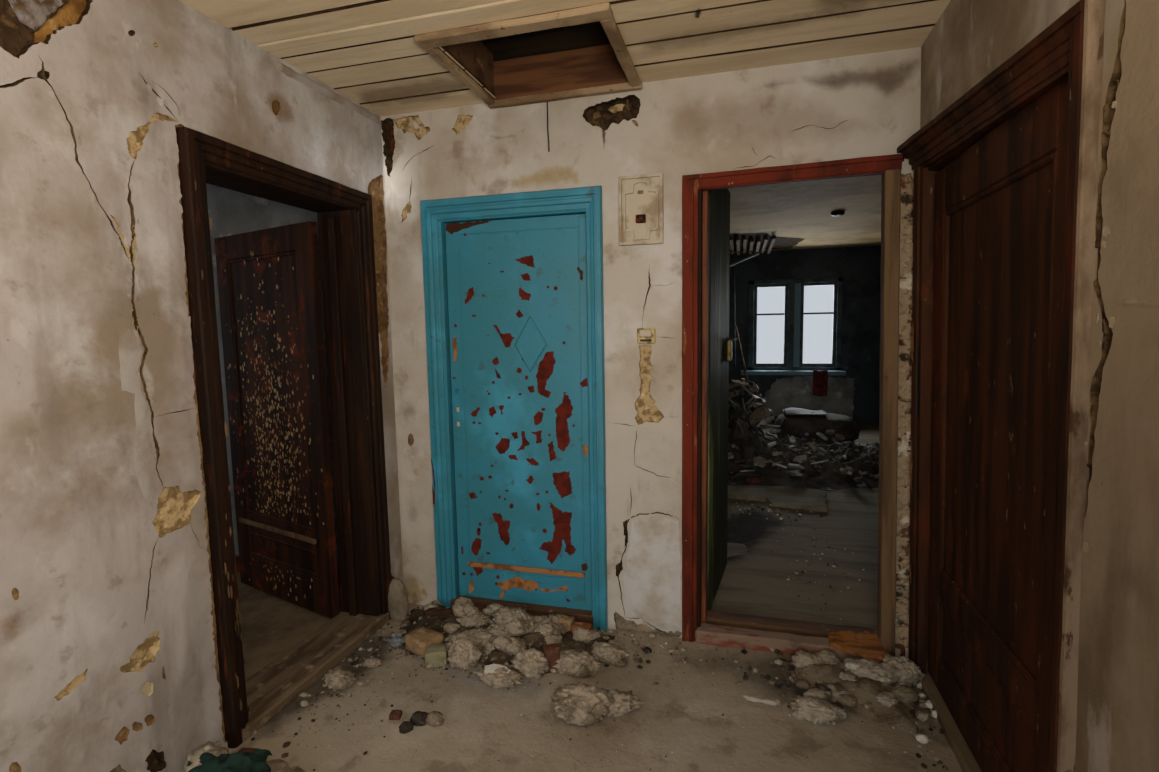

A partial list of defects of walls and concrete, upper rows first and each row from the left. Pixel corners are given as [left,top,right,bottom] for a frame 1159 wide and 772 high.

flaking render [0,0,93,59]
flaking render [126,113,184,160]
flaking render [583,95,641,131]
crack [0,55,193,487]
flaking render [634,345,664,425]
flaking render [152,337,243,743]
crack [614,423,677,632]
flaking render [54,668,88,701]
flaking render [120,630,166,696]
flaking render [115,714,155,745]
flaking render [9,762,21,772]
flaking render [145,749,166,772]